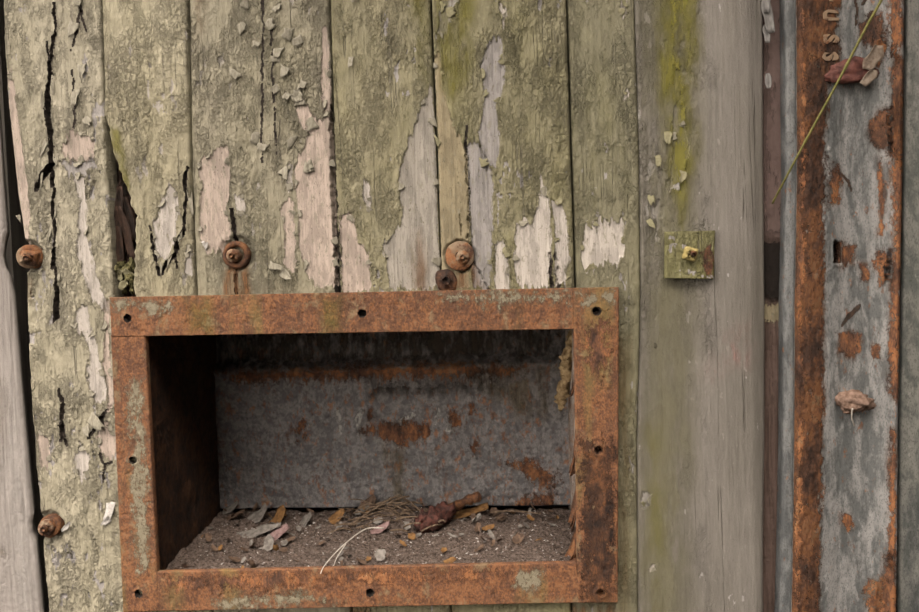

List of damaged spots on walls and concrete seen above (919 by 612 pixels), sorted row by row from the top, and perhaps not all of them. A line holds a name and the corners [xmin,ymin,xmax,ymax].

crack [34,2,87,323]
crack [57,388,113,483]
peeling [60,115,116,483]
peeling [152,182,181,260]
peeling [184,145,247,276]
peeling [263,0,372,292]
corrosion [163,566,513,595]
corrosion [215,355,531,388]
corrosion [356,406,431,450]
peeling [382,0,625,291]
corrosion [500,432,618,603]
corrosion [792,0,904,612]